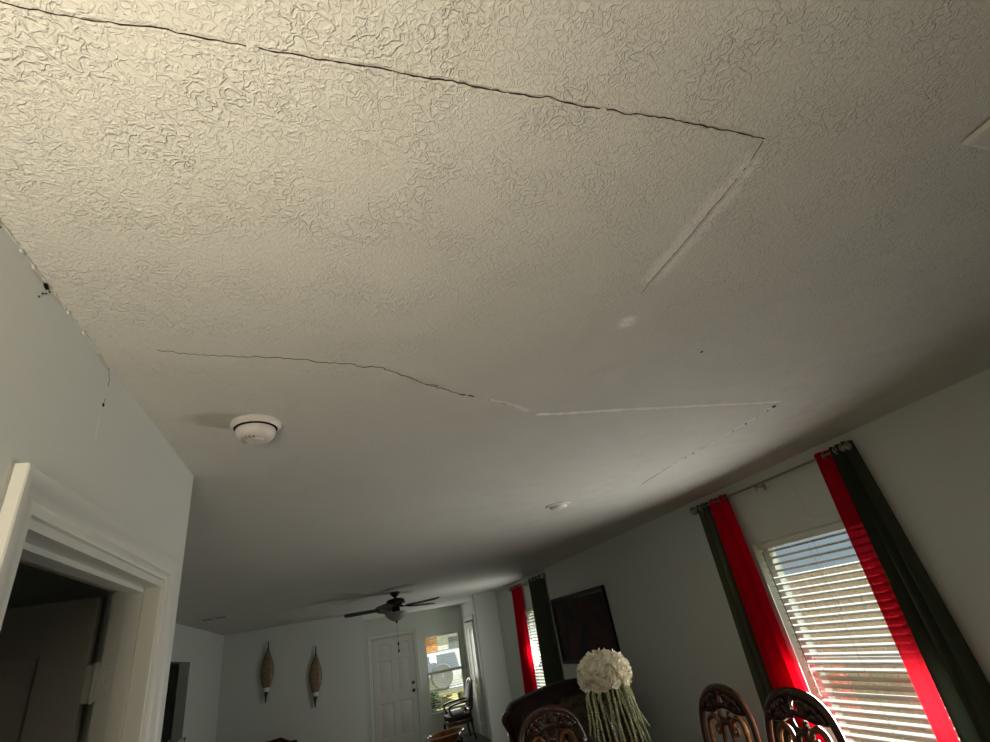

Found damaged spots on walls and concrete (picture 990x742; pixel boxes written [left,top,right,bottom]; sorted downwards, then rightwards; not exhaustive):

crack [0,0,767,143]
crack [155,350,536,416]